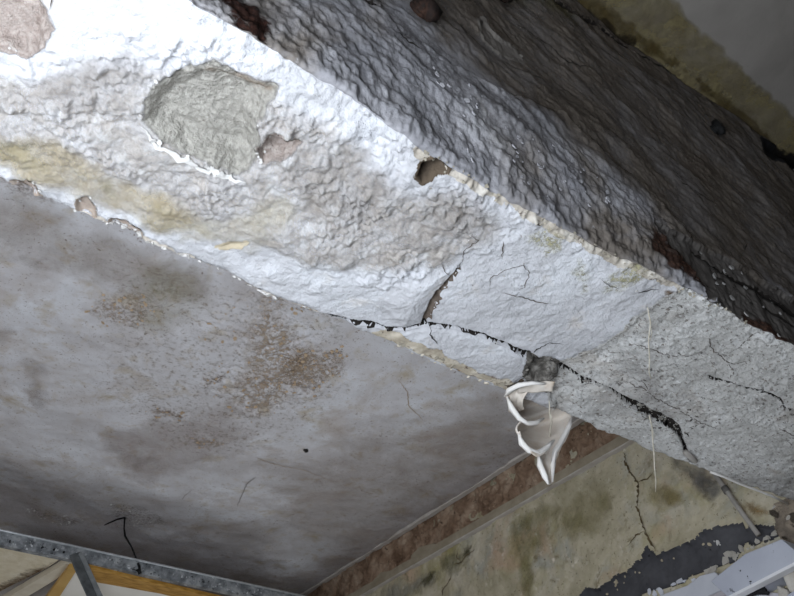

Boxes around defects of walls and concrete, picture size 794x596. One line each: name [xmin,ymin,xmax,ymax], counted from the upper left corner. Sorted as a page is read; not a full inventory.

flaking render [0,0,55,59]
corrosion [221,0,271,45]
flaking render [34,56,323,207]
peeling [290,0,794,596]
crack [691,252,794,327]
crack [331,234,716,450]
crack [635,334,792,411]
crack [623,452,655,548]
damp [692,471,719,497]